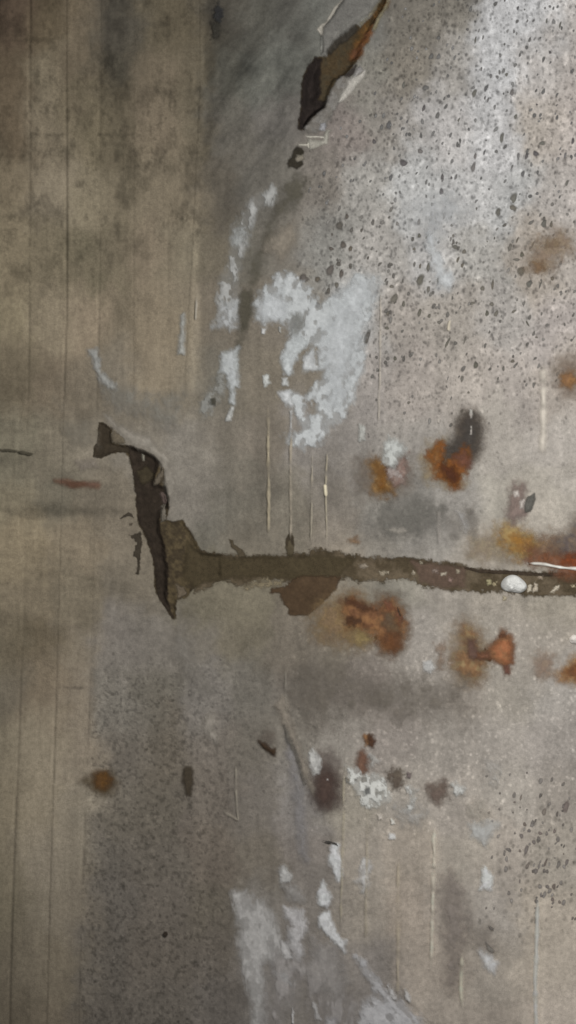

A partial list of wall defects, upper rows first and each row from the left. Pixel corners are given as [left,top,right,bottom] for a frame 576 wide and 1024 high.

spalling [288,0,389,169]
spalling [471,5,576,190]
water stain [217,181,375,447]
water stain [201,344,240,421]
rust [362,458,407,493]
rust [424,409,483,490]
crack [122,512,142,574]
crack [182,540,576,601]
rust [470,483,576,579]
rust [316,595,408,653]
rust [436,625,515,682]
rust [84,771,116,793]